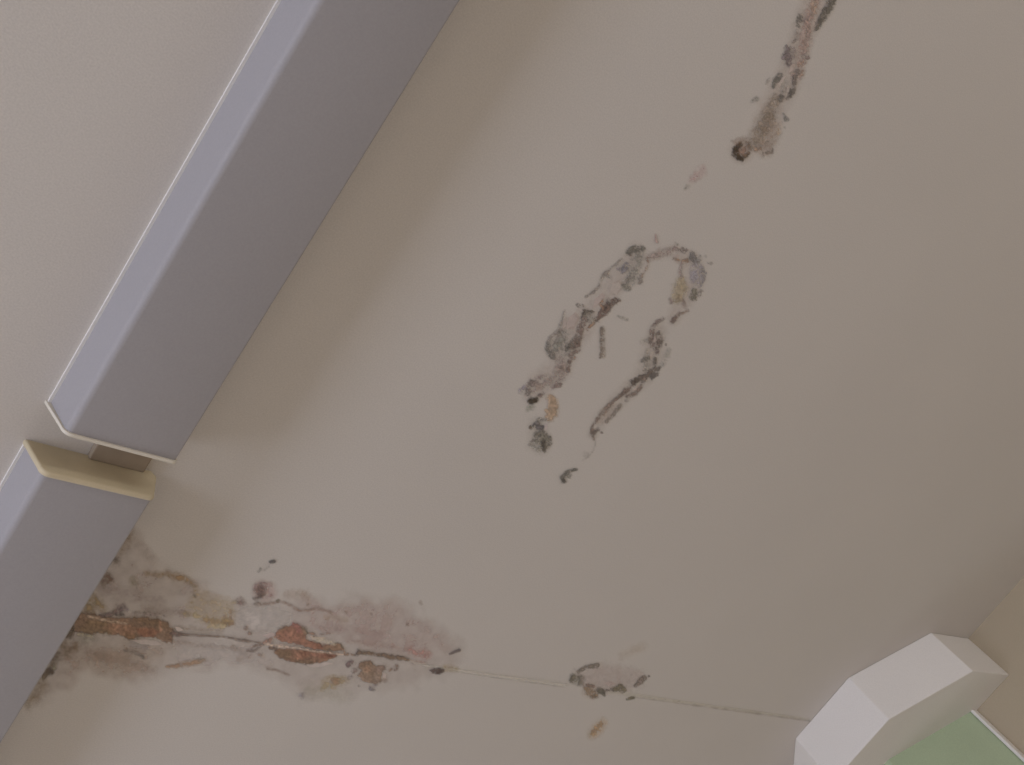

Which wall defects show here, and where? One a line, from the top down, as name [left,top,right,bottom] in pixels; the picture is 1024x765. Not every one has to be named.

peeling [519,235,706,453]
water stain [193,582,314,635]
water stain [42,626,77,680]
crack [182,634,261,644]
crack [355,649,461,674]
peeling [569,663,650,700]